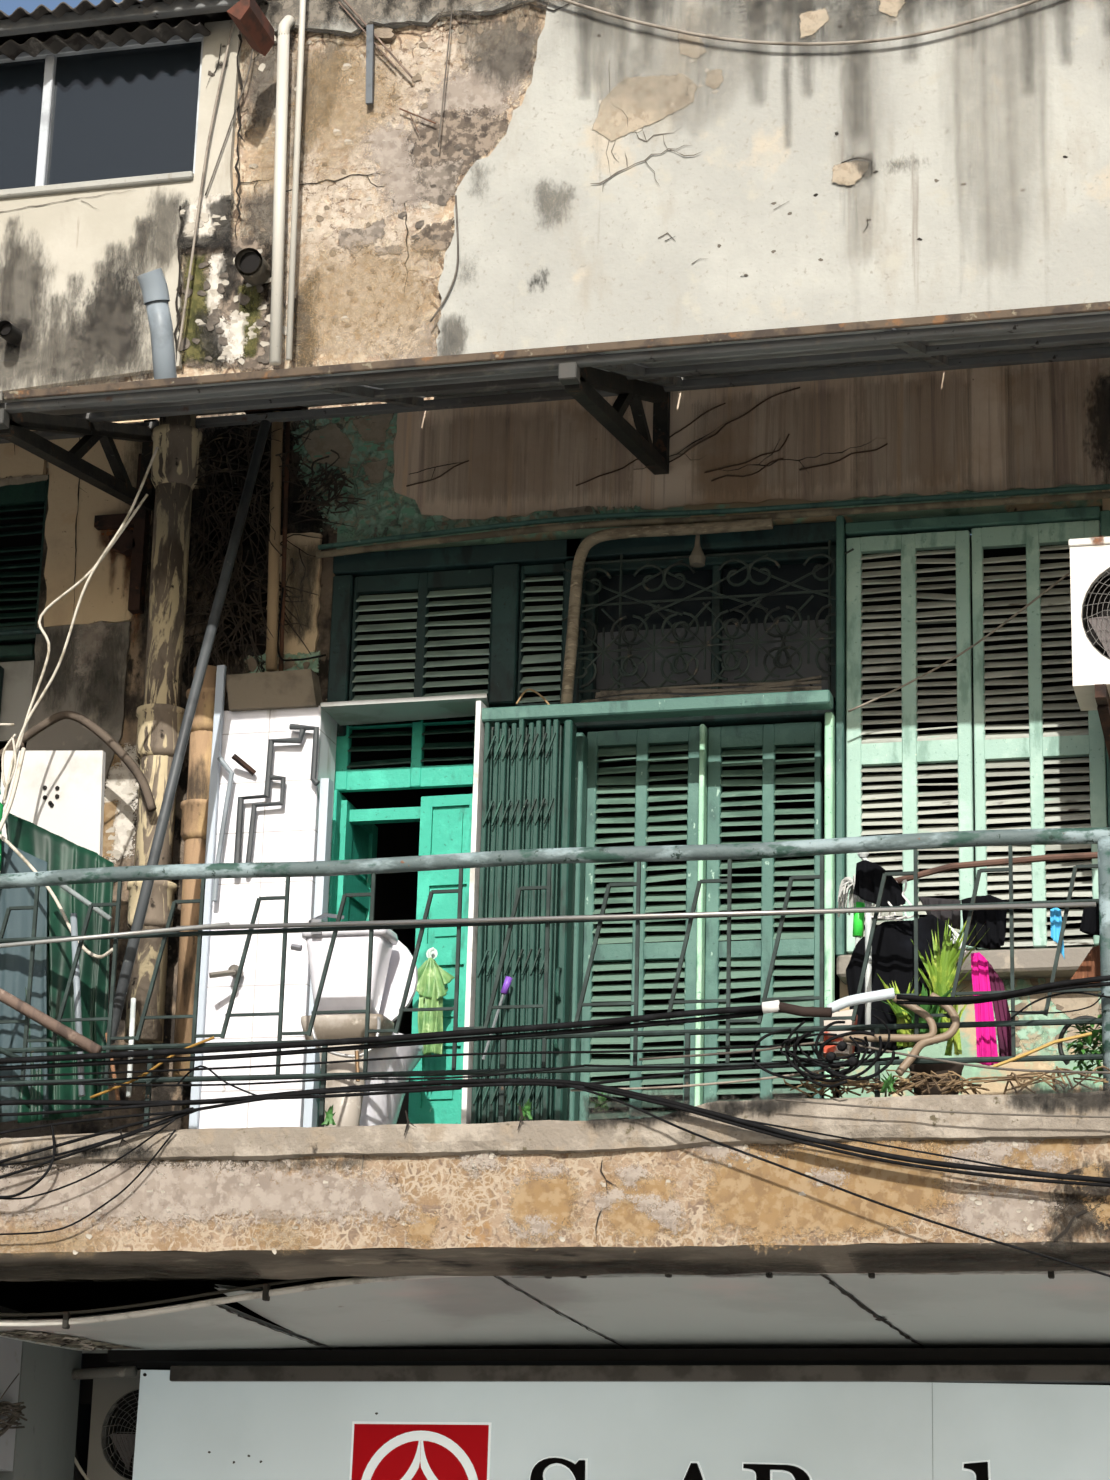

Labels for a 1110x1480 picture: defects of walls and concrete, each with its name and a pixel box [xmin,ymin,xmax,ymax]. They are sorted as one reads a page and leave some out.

peeling [797,7,843,39]
peeling [879,0,905,22]
crack [590,61,700,192]
peeling [592,32,723,141]
peeling [177,15,540,372]
damp [0,198,179,391]
damp [239,285,259,352]
peeling [290,413,641,541]
crack [634,421,876,472]
damp [852,1161,1110,1275]
crack [494,1276,627,1349]
crack [820,1274,924,1348]